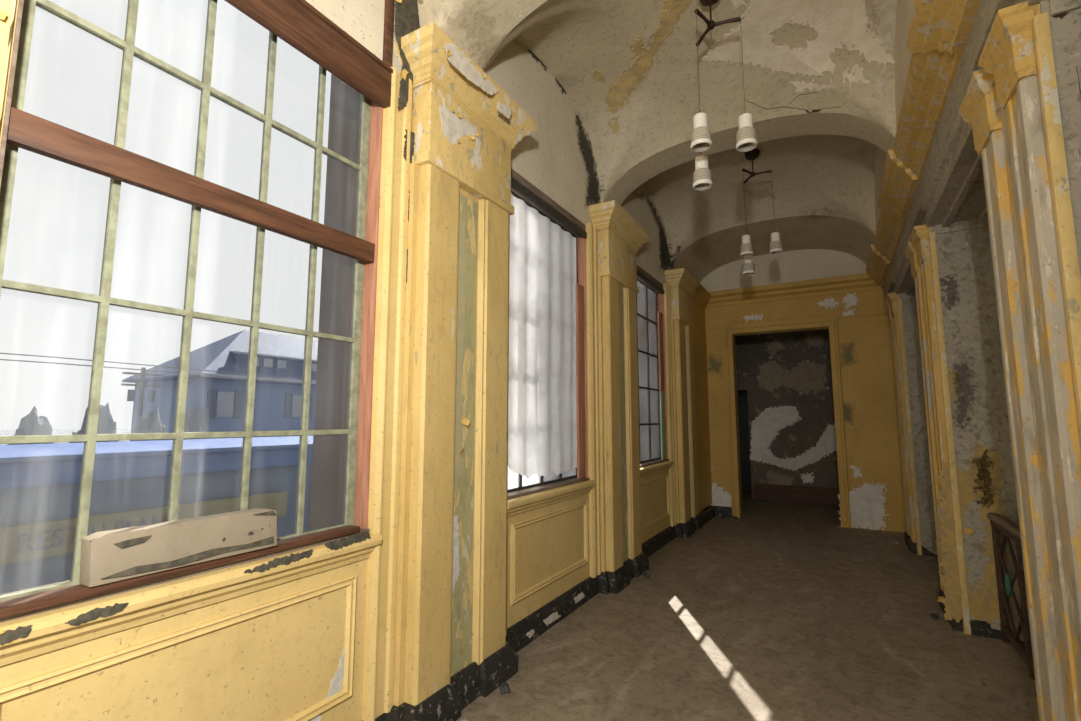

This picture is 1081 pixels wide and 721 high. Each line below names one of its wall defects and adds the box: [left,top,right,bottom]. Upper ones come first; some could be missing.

peeling [394,0,420,110]
flaking render [700,0,897,98]
peeling [444,43,512,119]
peeling [403,129,415,163]
peeling [439,105,479,145]
spalling [837,465,889,530]
peeling [115,535,152,548]
peeling [102,537,274,579]
peeling [244,531,371,574]
peeling [936,441,1015,624]
peeling [0,625,32,645]
peeling [65,603,129,626]